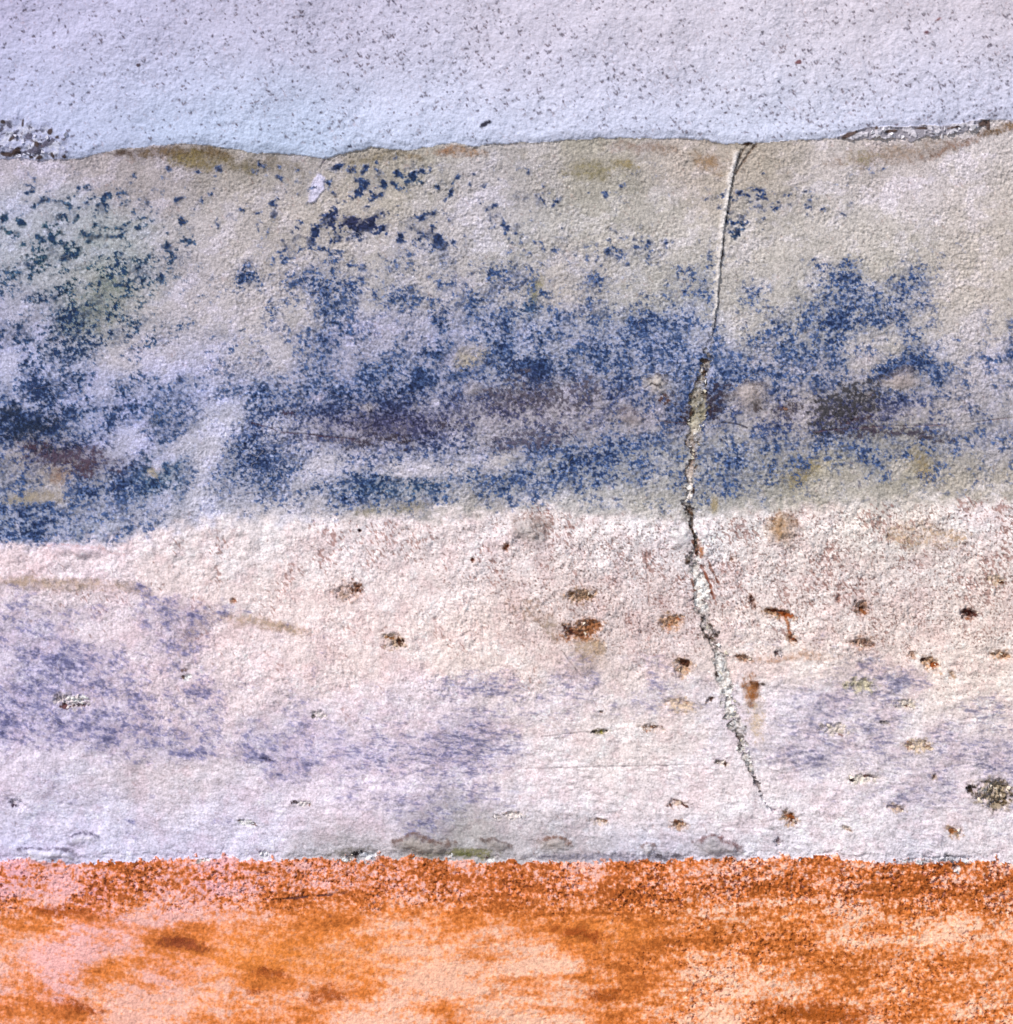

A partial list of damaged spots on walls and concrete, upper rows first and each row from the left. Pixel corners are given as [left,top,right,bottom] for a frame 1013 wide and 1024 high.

peeling [0,119,68,161]
peeling [837,119,990,142]
crack [713,142,753,327]
water stain [0,146,1013,549]
crack [665,354,758,782]
corrosion [30,906,92,918]
corrosion [158,937,209,952]
corrosion [551,927,599,943]
corrosion [302,984,347,1005]
corrosion [590,989,618,1001]
corrosion [760,998,874,1024]